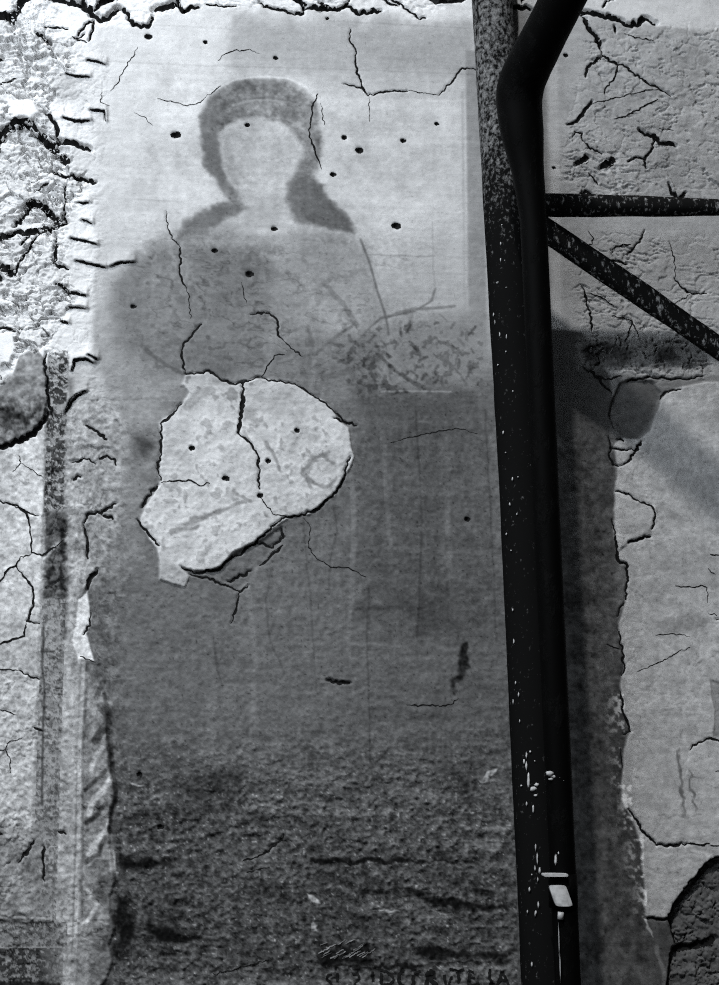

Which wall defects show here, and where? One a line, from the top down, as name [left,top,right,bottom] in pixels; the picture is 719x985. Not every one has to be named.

crack [0,0,236,106]
crack [260,0,476,121]
crack [567,0,676,194]
crack [0,113,96,281]
crack [0,353,54,476]
crack [0,500,60,645]
crack [72,425,116,481]
crack [80,403,210,662]
peeling [140,372,355,590]
crack [166,211,366,624]
peeling [614,382,719,985]
crack [629,810,719,983]